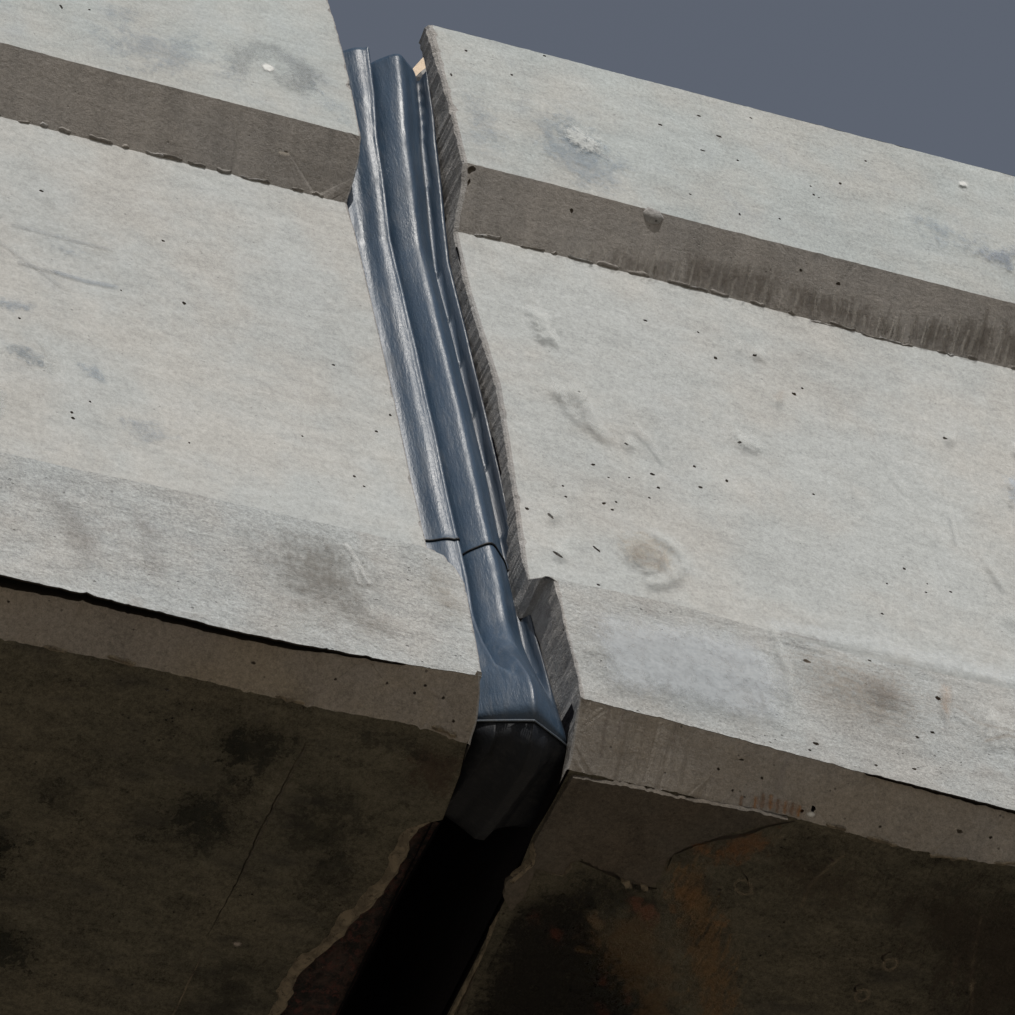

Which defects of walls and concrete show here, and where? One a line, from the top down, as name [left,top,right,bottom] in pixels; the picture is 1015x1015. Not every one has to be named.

spalling [268,821,439,1015]
peeling [450,774,788,1015]
crack [580,821,795,890]